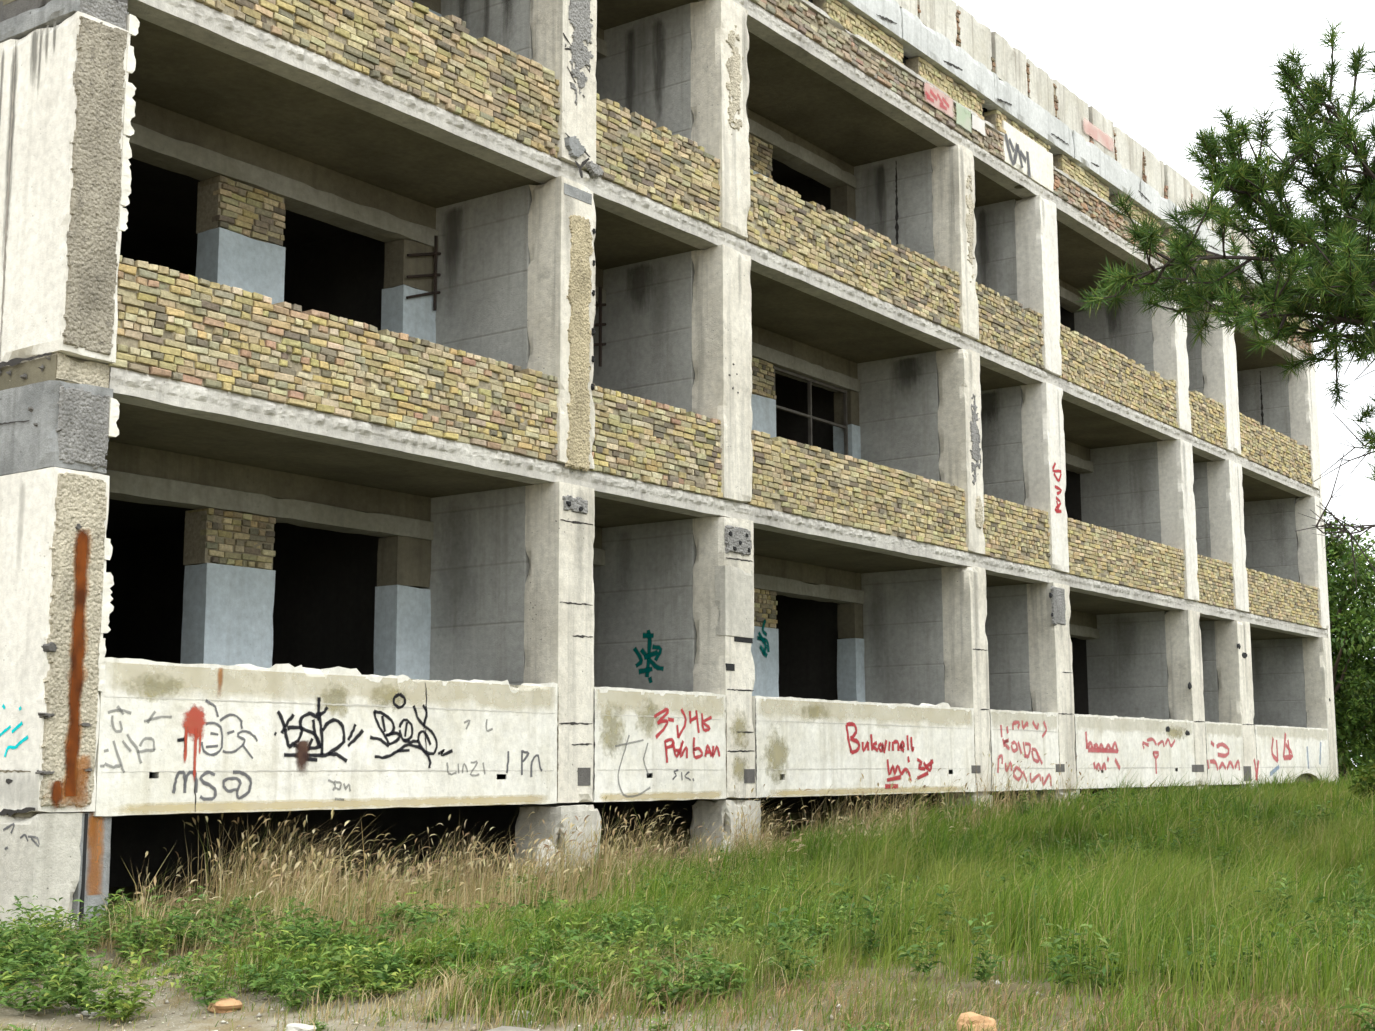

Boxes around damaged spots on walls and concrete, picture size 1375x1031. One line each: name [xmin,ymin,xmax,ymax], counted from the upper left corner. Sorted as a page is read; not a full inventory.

spalling [60,0,140,355]
spalling [565,0,594,106]
spalling [725,25,744,135]
spalling [565,215,596,472]
corrosion [52,530,89,808]
spalling [35,385,120,808]
corrosion [88,816,103,895]